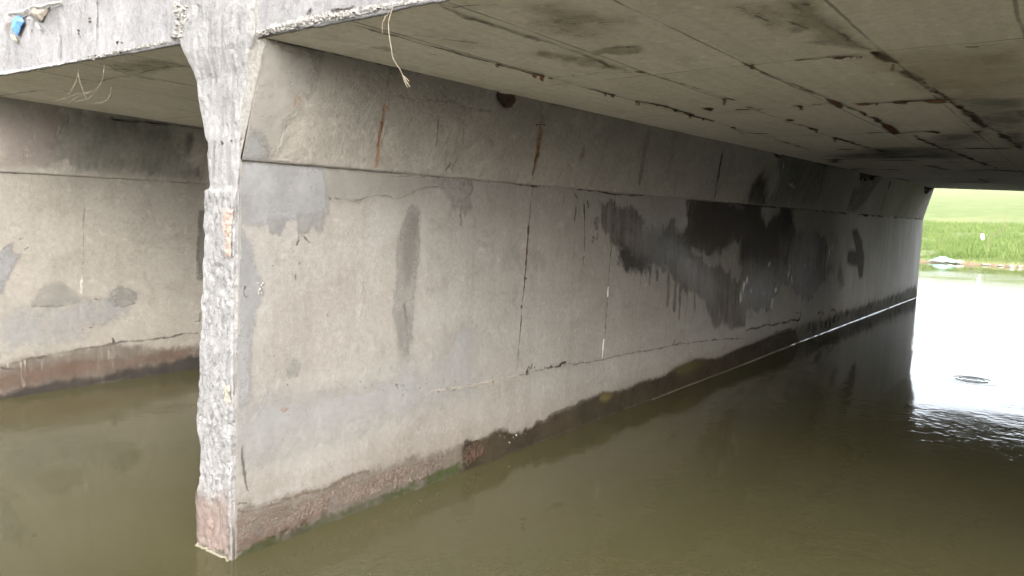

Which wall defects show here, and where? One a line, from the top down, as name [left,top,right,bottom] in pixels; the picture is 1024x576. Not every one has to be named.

spalling [0,1,189,75]
peeling [249,0,424,155]
crack [363,5,1024,277]
crack [1,356,47,370]
damp [58,287,136,333]
crack [76,338,124,351]
damp [238,135,328,405]
damp [394,206,420,354]
crack [485,180,644,375]
damp [601,160,828,328]
crack [643,309,836,352]
damp [847,229,864,278]